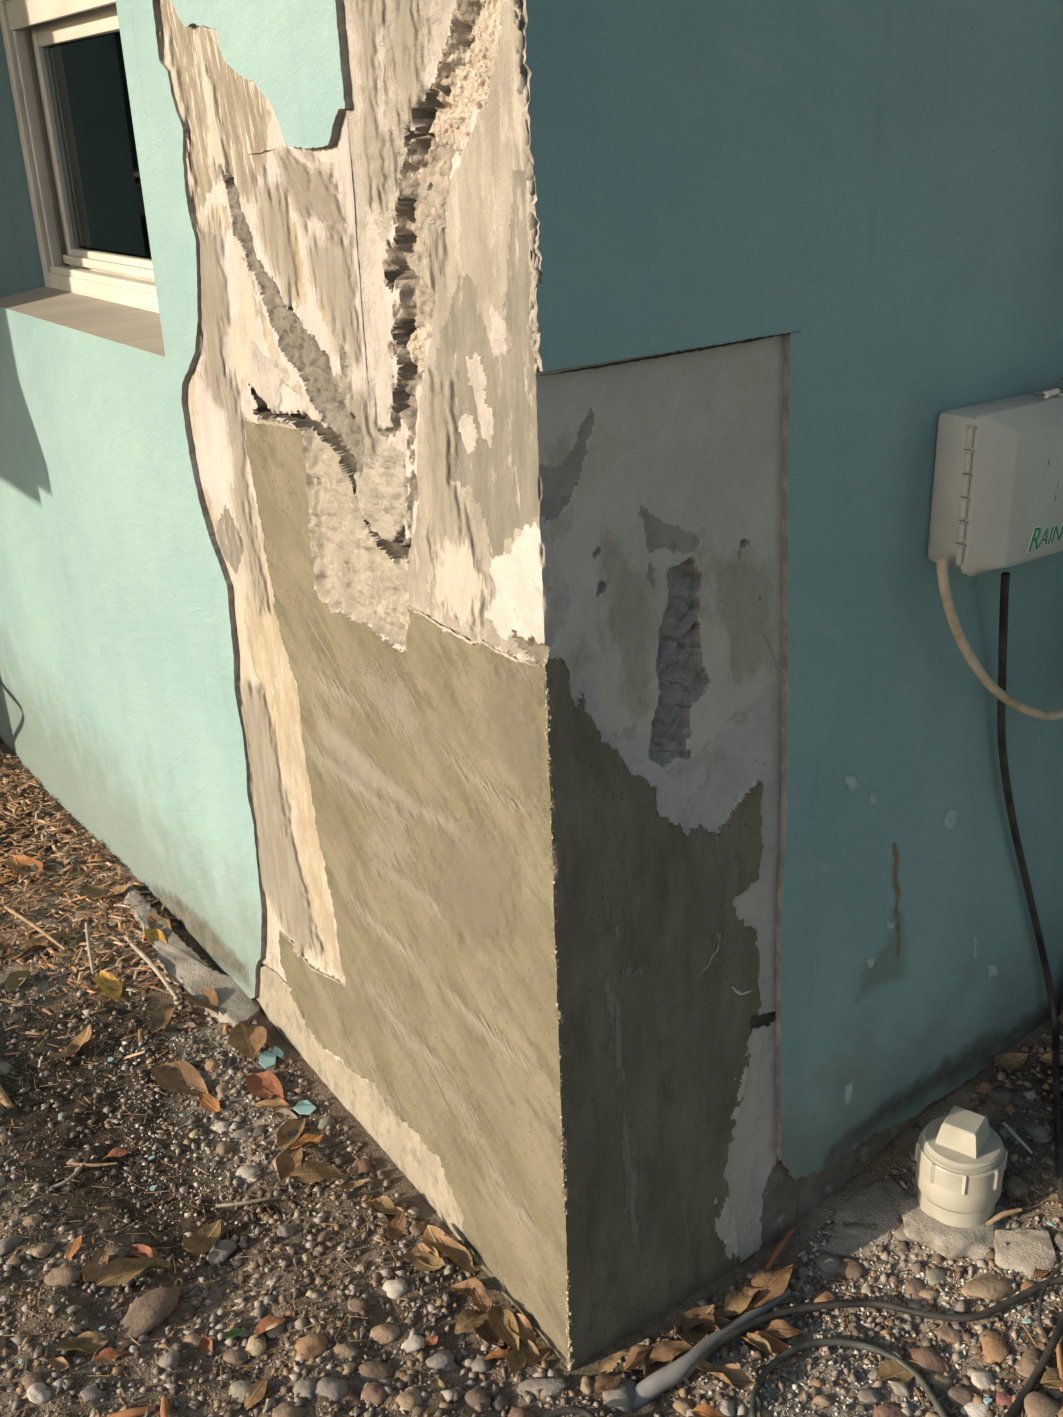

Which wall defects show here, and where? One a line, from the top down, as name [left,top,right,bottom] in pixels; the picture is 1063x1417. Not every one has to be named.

peeling [159,0,797,1263]
spalling [565,1269,575,1371]